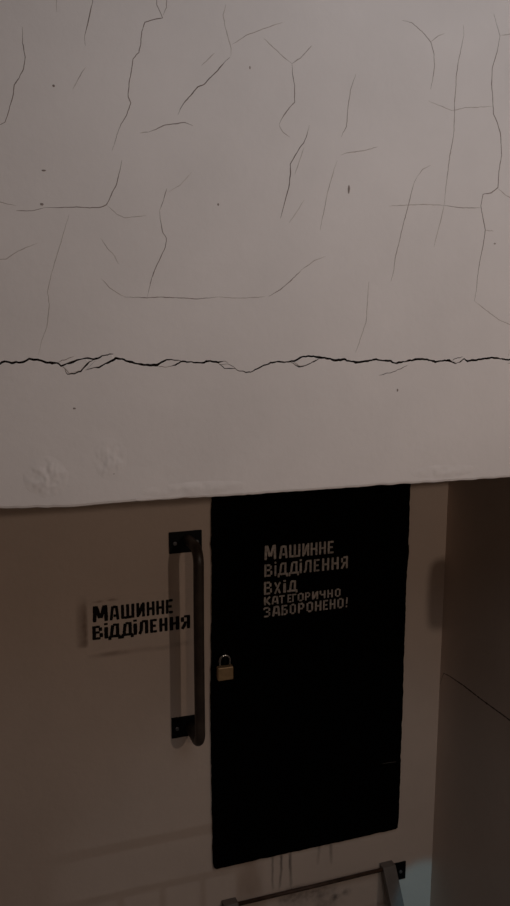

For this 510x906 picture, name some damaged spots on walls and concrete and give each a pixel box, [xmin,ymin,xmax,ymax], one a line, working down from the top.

crack [0,0,510,375]